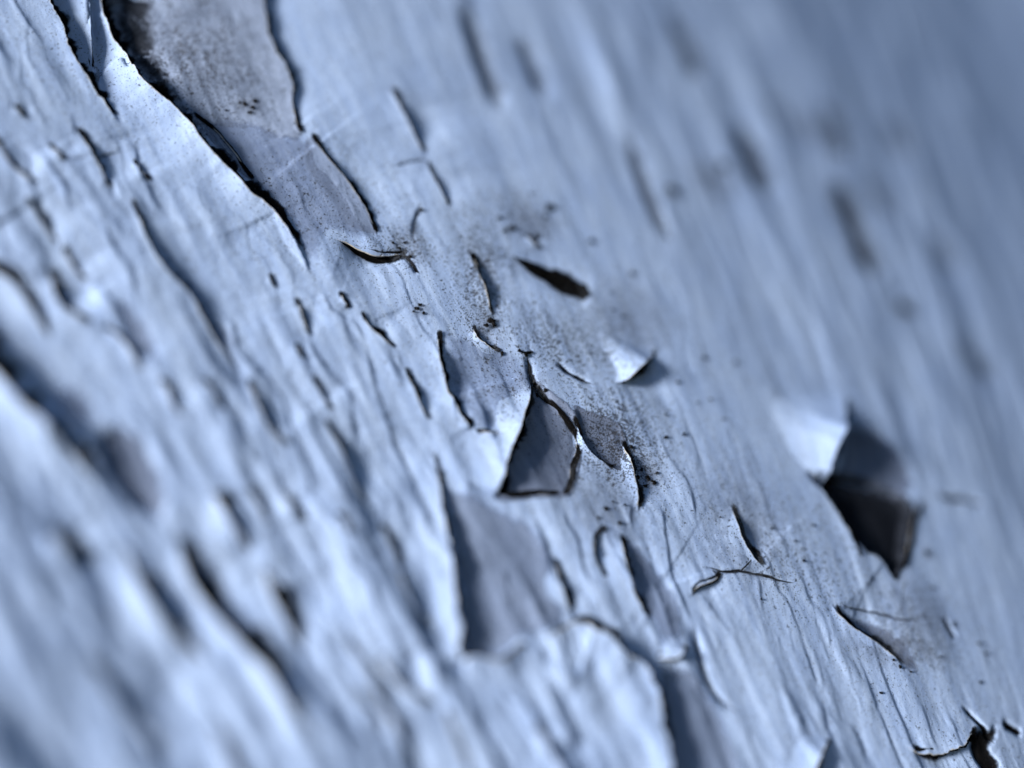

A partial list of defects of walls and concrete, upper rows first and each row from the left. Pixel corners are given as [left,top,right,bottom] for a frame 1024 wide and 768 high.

peeling [22,0,378,268]
crack [341,204,422,273]
crack [514,256,591,300]
crack [519,348,552,405]
crack [558,362,592,384]
spalling [771,393,924,580]
peeling [369,325,739,768]
crack [706,560,793,583]
crack [840,581,919,621]
spalling [905,717,998,768]